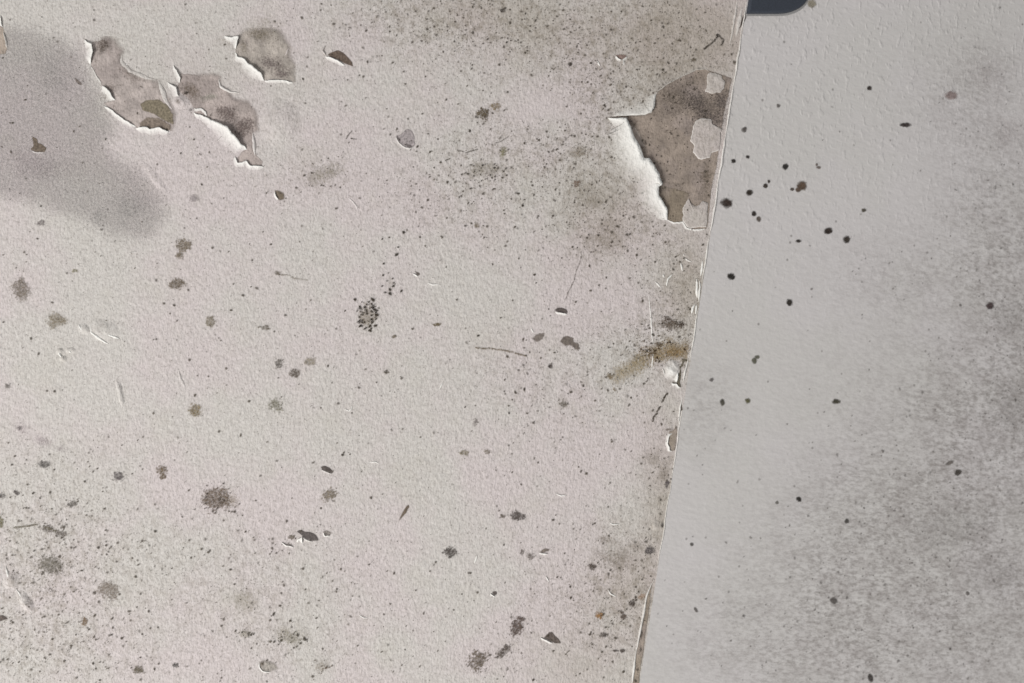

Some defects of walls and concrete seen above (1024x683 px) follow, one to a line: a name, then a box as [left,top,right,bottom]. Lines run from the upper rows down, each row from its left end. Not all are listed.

peeling [84,38,264,170]
peeling [224,29,294,84]
peeling [321,46,353,66]
peeling [607,0,747,572]